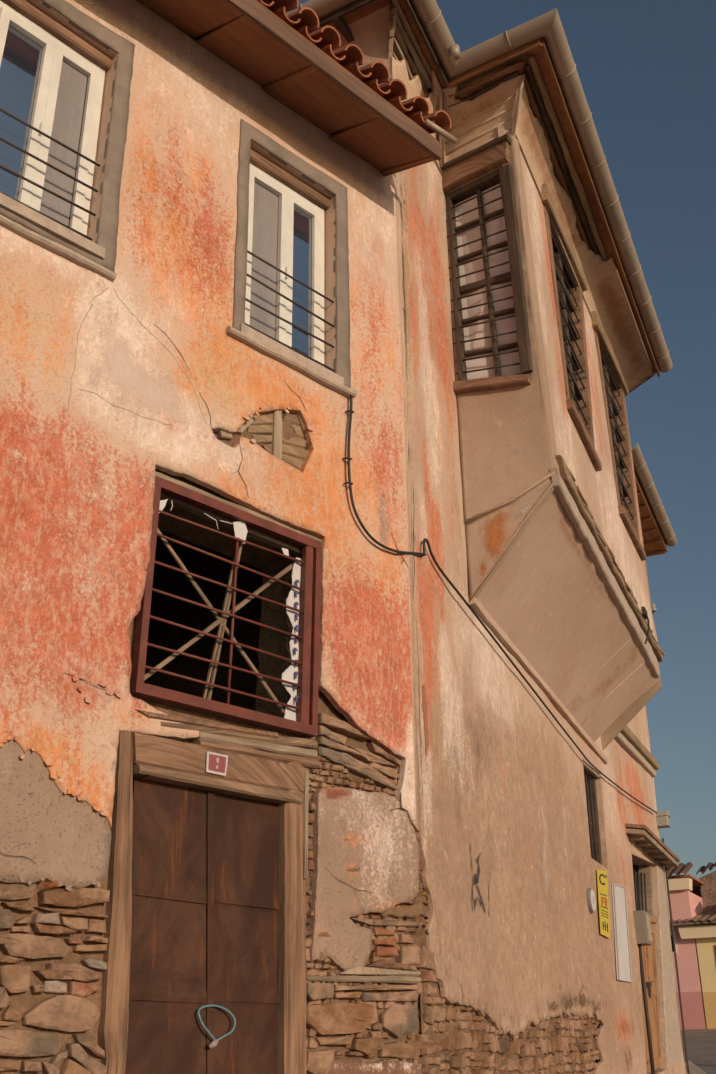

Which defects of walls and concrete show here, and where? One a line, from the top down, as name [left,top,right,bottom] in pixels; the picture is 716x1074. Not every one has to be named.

peeling [0,733,111,892]
spalling [550,993,598,1013]